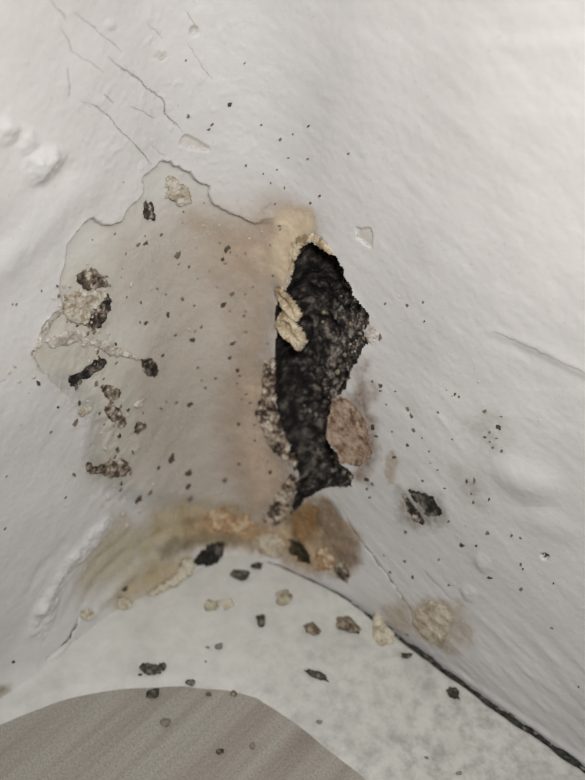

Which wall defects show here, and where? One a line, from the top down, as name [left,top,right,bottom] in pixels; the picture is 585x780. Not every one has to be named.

crack [51,0,180,128]
crack [86,93,165,165]
water stain [215,195,321,312]
peeling [31,161,379,583]
water stain [228,309,287,512]
water stain [86,470,235,597]
peeling [147,555,195,596]